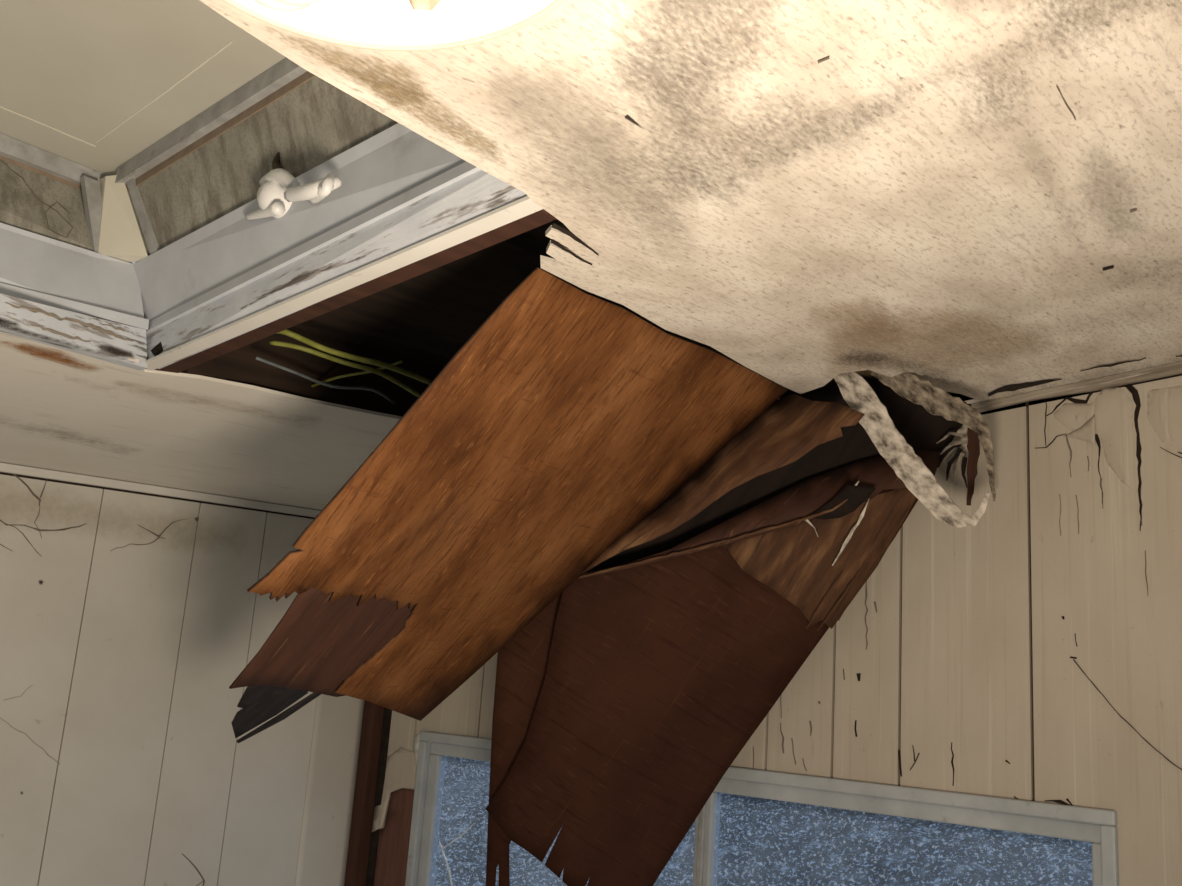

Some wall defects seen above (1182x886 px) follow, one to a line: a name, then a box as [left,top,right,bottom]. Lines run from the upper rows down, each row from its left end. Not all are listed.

leakage [305,46,493,154]
peeling [150,342,163,356]
crack [0,474,87,556]
crack [111,519,185,551]
peeling [725,487,916,629]
peeling [371,729,430,886]